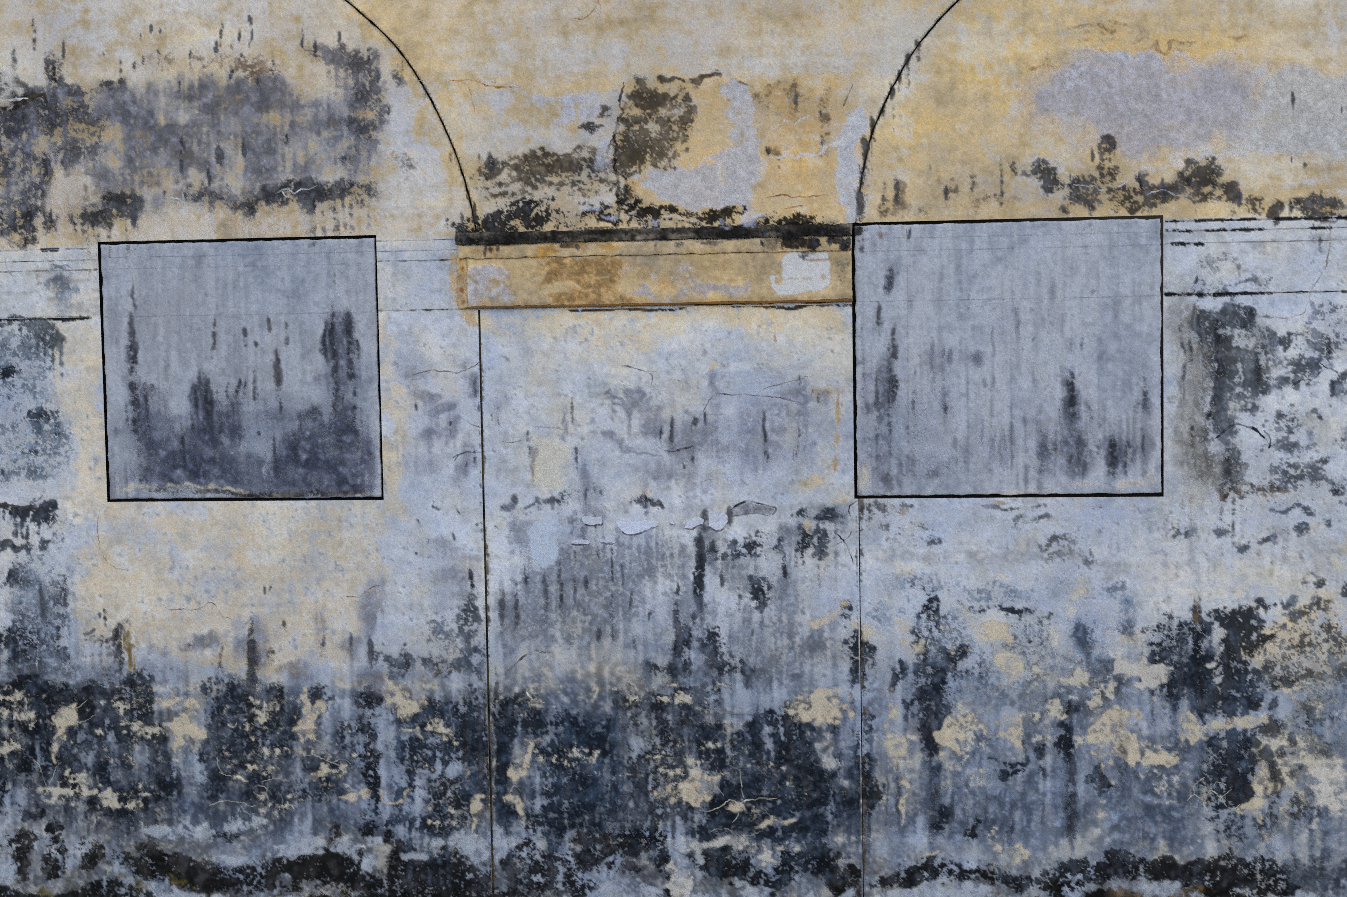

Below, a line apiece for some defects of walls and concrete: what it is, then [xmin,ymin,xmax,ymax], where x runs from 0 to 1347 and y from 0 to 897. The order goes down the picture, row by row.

peeling [533,94,600,125]
peeling [596,128,612,168]
peeling [633,78,868,223]
damp [0,15,405,482]
damp [884,269,894,292]
damp [938,134,1347,554]
peeling [527,501,777,568]
peeling [952,612,1060,685]
peeling [0,690,35,726]
peeling [39,703,150,809]
peeling [885,704,907,756]
peeling [933,631,1347,828]